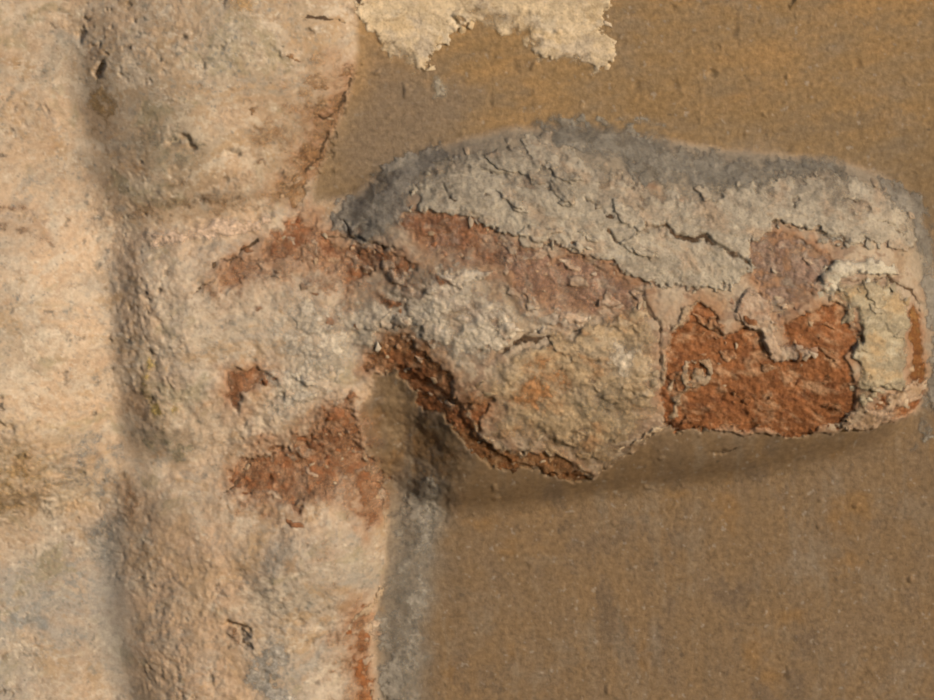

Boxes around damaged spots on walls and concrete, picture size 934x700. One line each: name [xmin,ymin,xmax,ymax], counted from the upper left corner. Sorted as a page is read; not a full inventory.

flaking render [354,0,617,96]
crack [305,78,352,175]
crack [587,200,618,244]
crack [646,223,749,264]
crack [772,220,850,245]
flaking render [267,130,927,481]
spalling [226,359,276,407]
spalling [231,377,391,529]